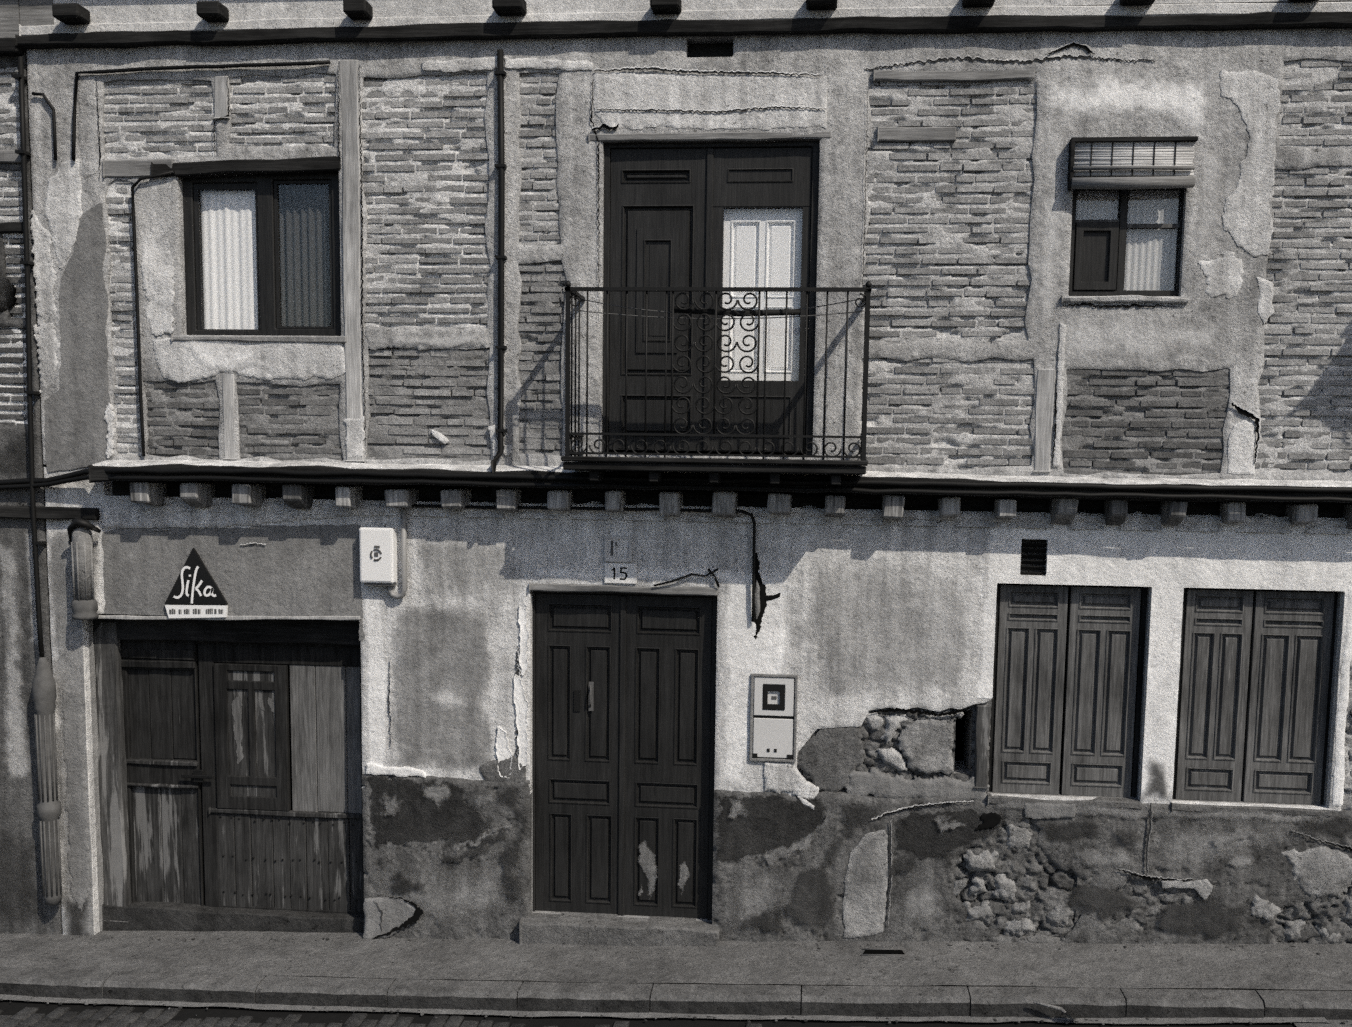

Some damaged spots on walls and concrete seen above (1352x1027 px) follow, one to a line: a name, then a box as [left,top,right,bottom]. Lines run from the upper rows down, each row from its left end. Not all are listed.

peeling [1198,70,1281,324]
crack [1228,401,1261,475]
peeling [638,841,657,896]
peeling [678,863,689,889]
spalling [716,704,1352,944]
crack [1291,829,1352,851]